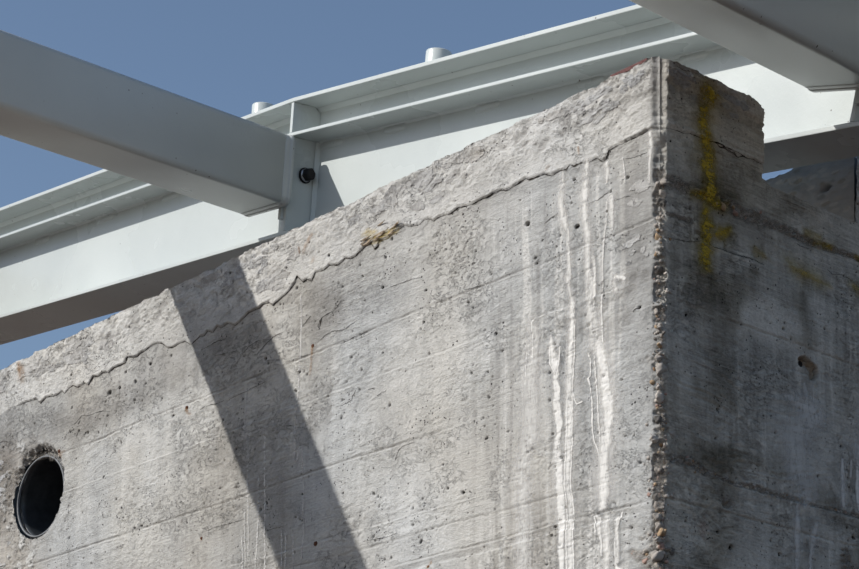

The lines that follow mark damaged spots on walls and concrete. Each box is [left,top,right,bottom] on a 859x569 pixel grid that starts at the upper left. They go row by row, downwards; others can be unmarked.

crack [27,128,761,404]
water stain [516,159,626,569]
spalling [621,176,859,569]
water stain [841,444,859,511]